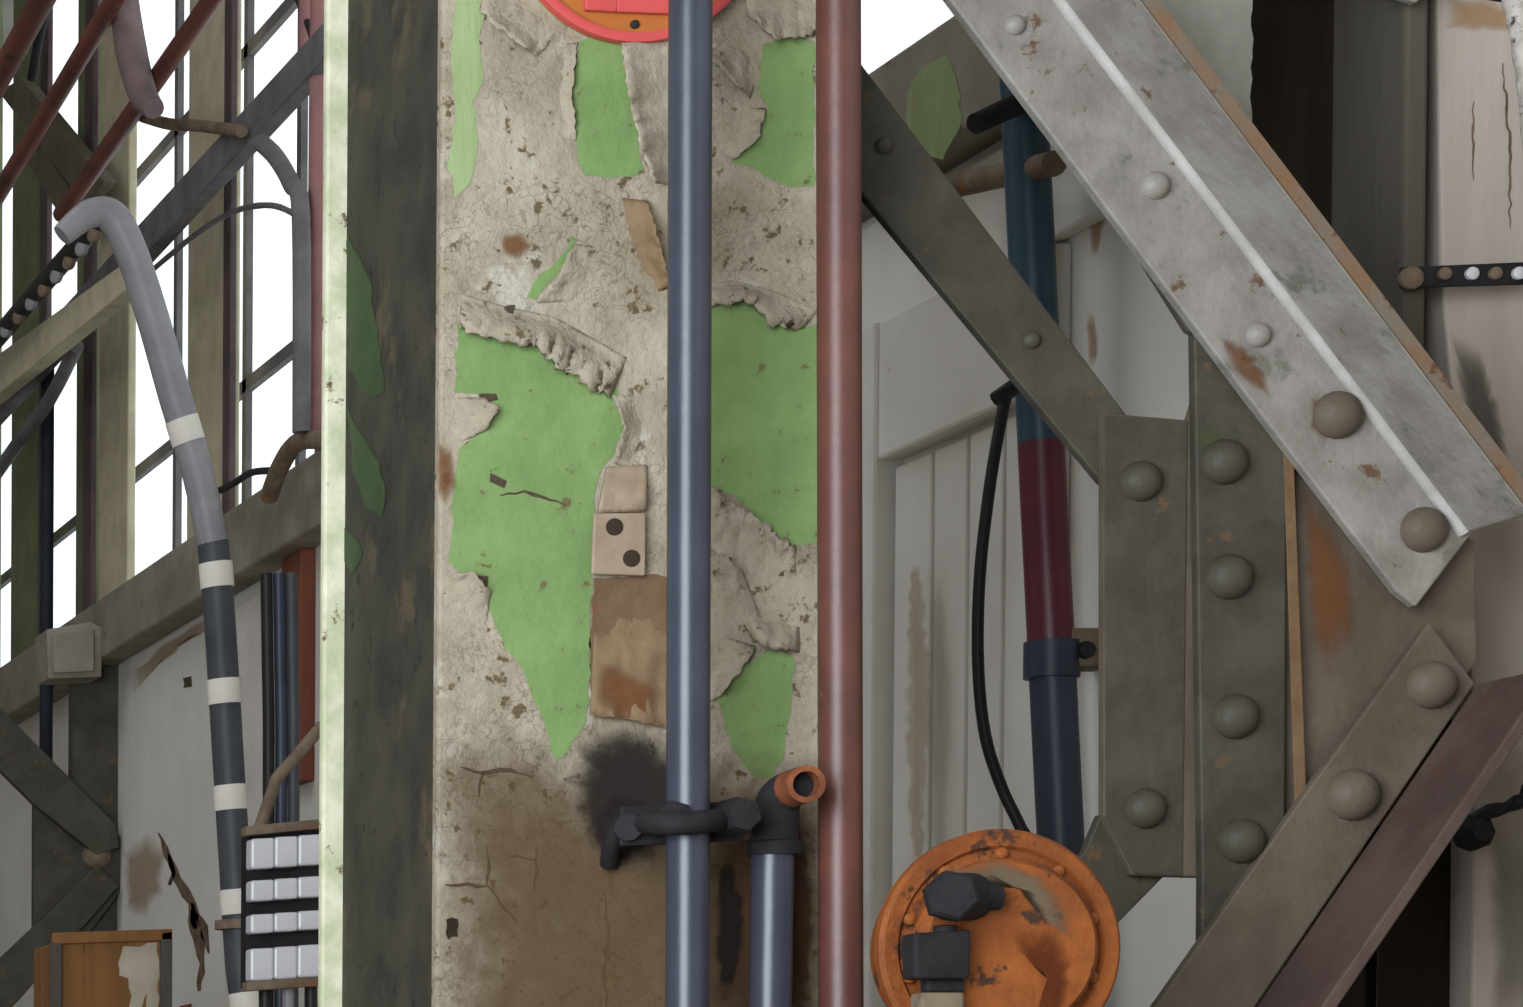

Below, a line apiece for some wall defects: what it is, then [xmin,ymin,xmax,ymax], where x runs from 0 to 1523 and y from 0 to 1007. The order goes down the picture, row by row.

peeling [447,0,668,198]
peeling [713,0,816,188]
crack [1472,63,1512,228]
peeling [622,198,667,292]
peeling [445,235,667,761]
peeling [711,280,817,779]
crack [461,767,530,795]
peeling [118,942,160,1007]
crack [445,866,491,888]
damp [462,768,666,1007]
damp [710,841,748,1007]